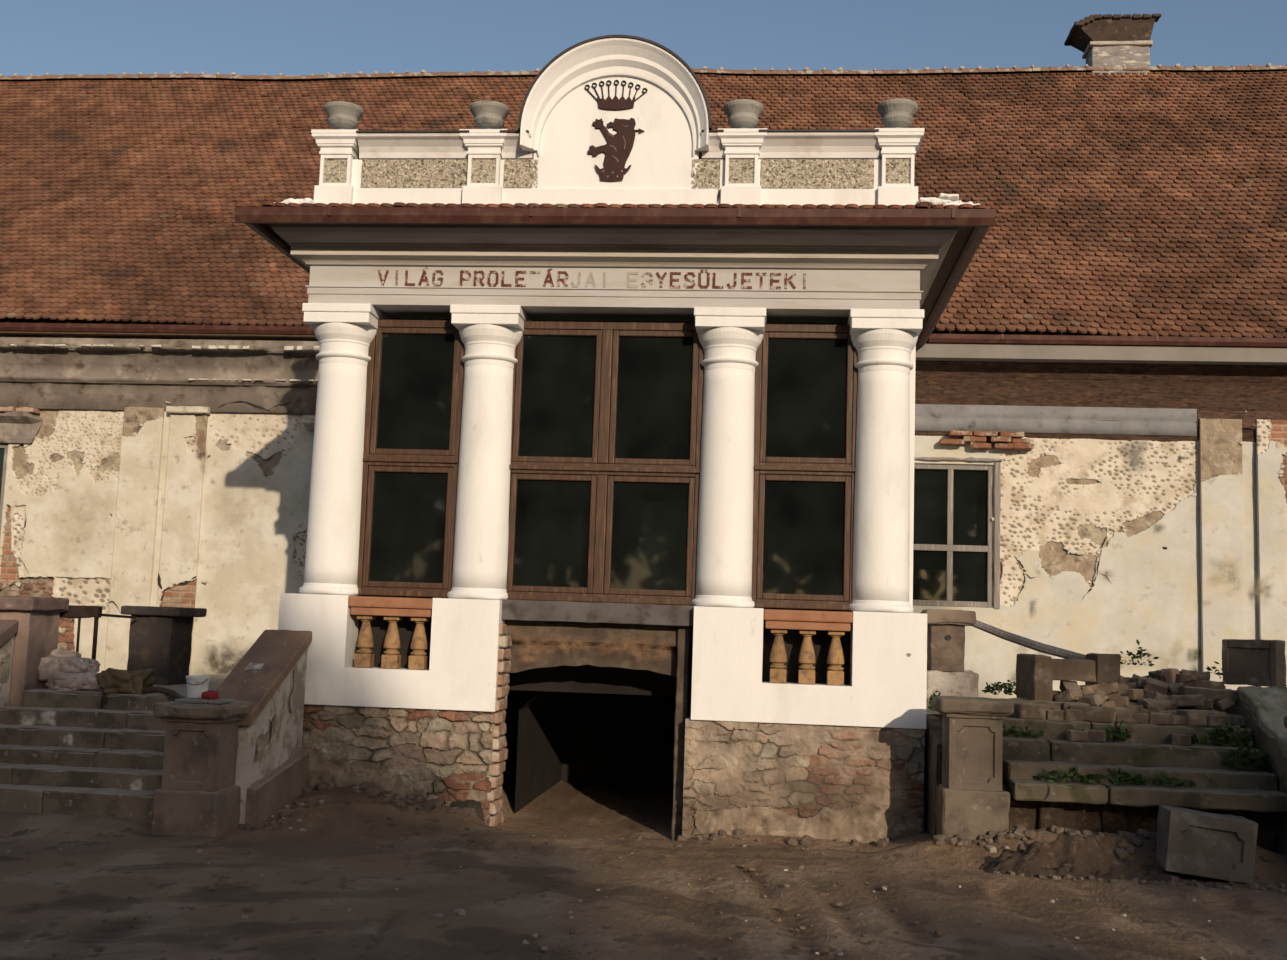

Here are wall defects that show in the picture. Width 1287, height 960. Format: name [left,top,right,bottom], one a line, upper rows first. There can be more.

flaking render [12,409,120,479]
flaking render [123,401,171,437]
flaking render [194,414,232,456]
flaking render [246,450,284,479]
flaking render [1027,452,1103,485]
flaking render [1184,411,1287,503]
flaking render [0,505,29,590]
flaking render [1038,511,1164,588]
flaking render [158,578,207,608]